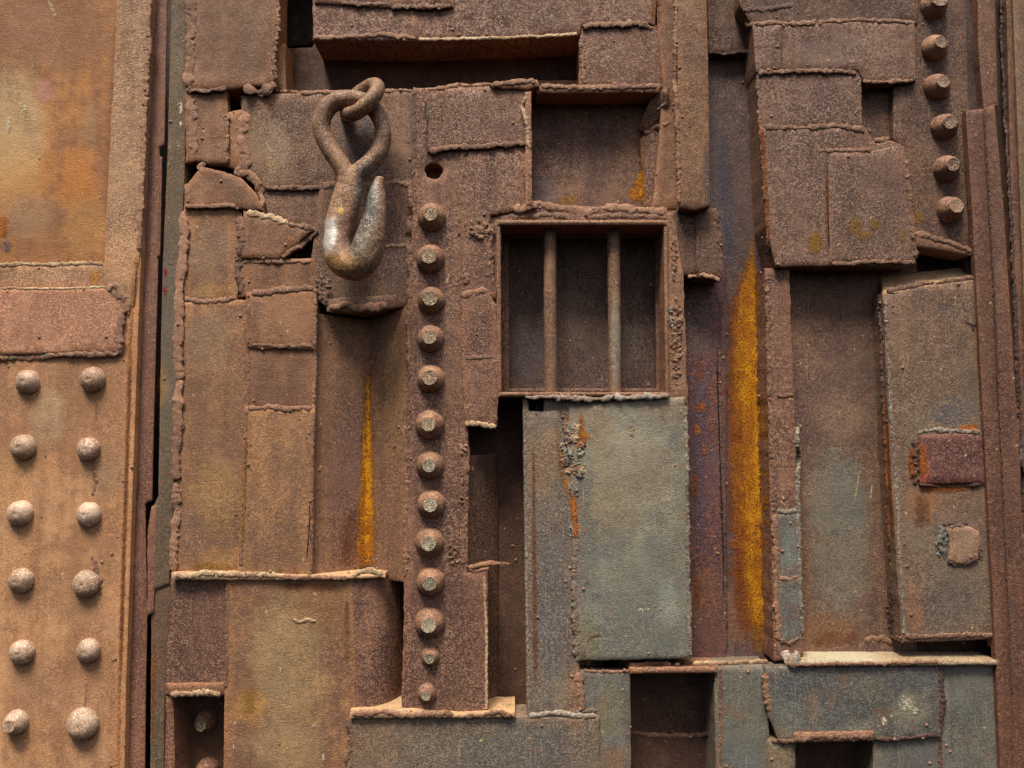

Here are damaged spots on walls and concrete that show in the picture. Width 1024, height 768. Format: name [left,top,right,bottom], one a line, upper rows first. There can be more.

corrosion [630,150,645,201]
corrosion [342,372,376,567]
corrosion [557,426,579,536]
corrosion [577,412,590,447]
corrosion [723,242,772,648]
corrosion [908,445,970,526]